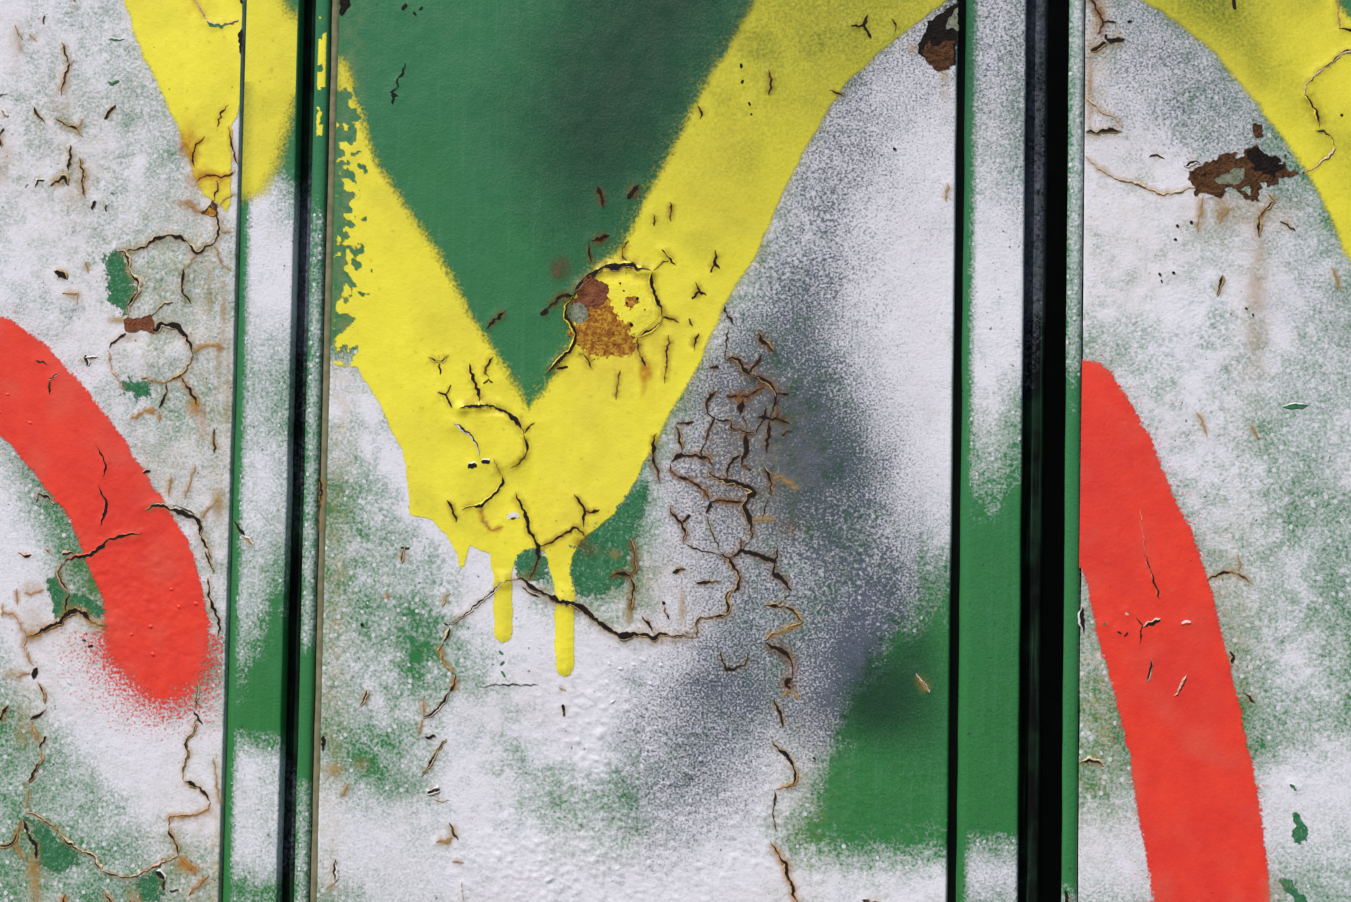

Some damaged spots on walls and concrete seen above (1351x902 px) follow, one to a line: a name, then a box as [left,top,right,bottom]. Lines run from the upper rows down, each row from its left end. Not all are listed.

crack [0,105,254,810]
crack [103,682,220,902]
crack [419,184,803,902]